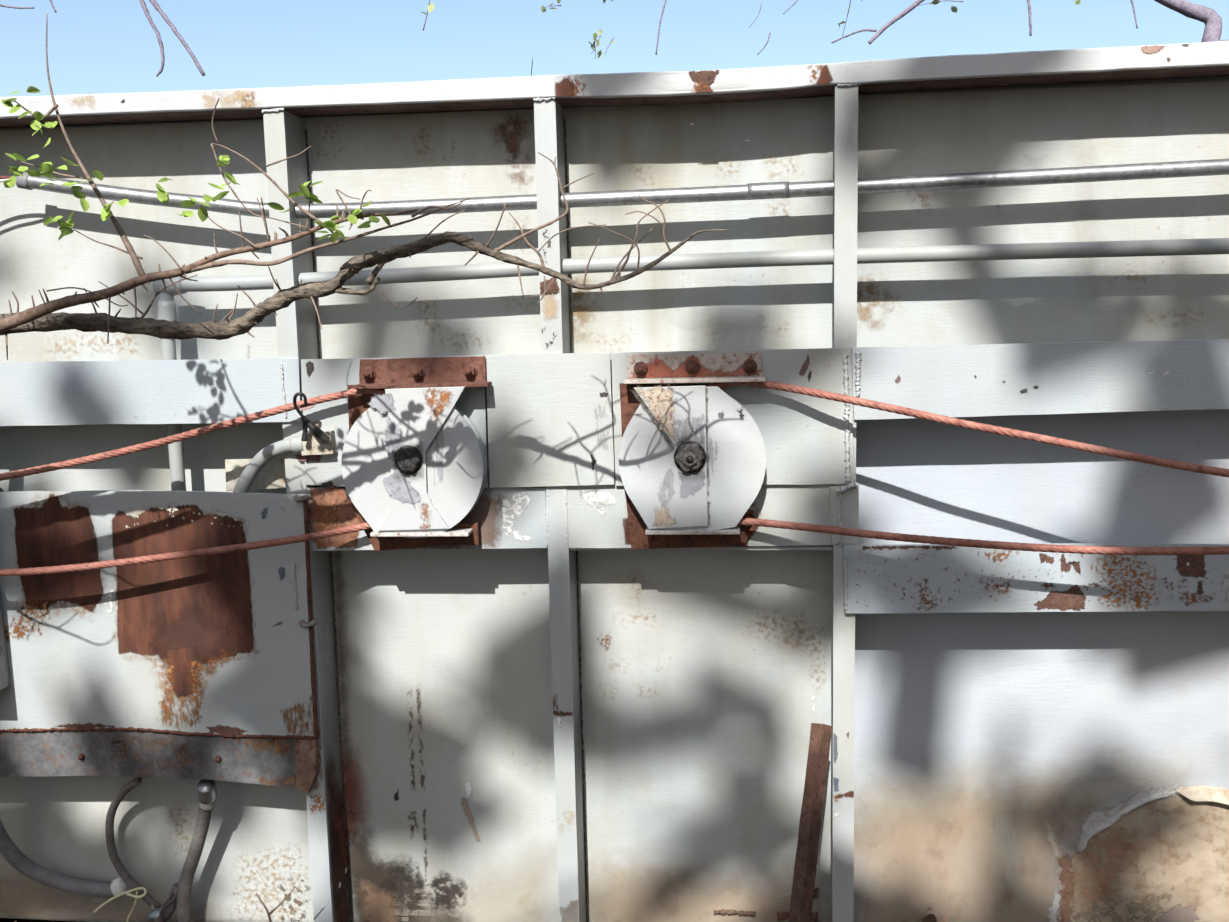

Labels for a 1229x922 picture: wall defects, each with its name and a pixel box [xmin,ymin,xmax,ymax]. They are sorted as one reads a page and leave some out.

rust [555,76,585,96]
rust [688,70,719,93]
rust [632,355,760,440]
peeling [368,393,421,504]
rust [862,546,956,560]
rust [883,550,1227,611]
rust [5,486,361,922]
damp [409,689,425,787]
damp [346,810,537,922]
peeling [1045,784,1229,922]